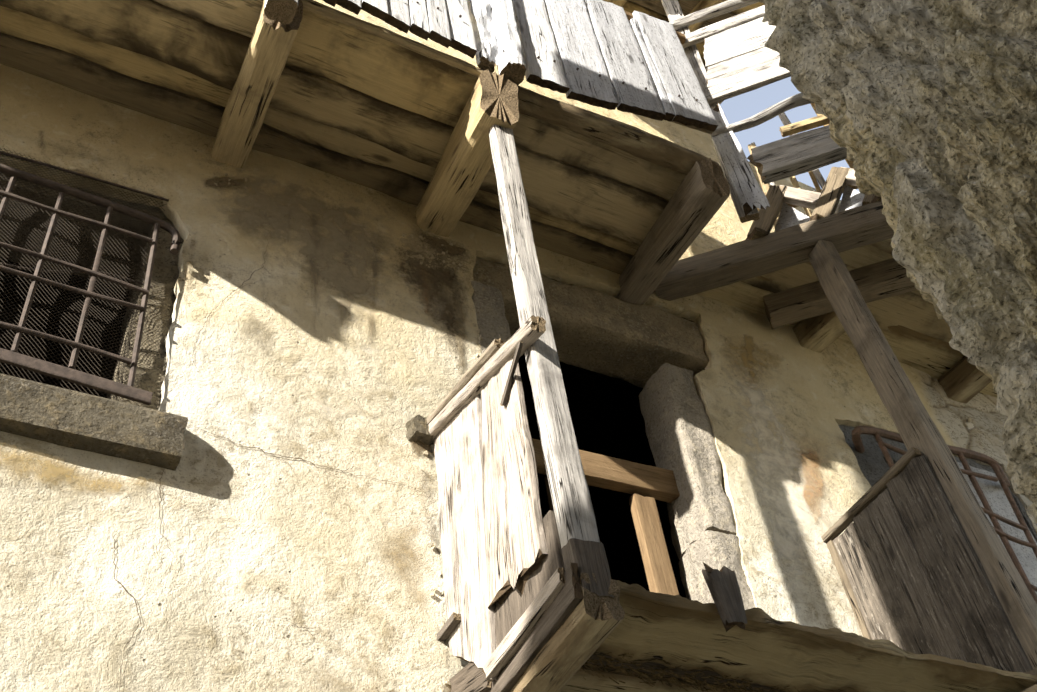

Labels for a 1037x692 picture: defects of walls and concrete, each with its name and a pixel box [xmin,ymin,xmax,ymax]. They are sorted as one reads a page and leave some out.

crack [192,239,272,365]
water stain [229,179,384,314]
water stain [399,233,465,367]
crack [156,470,171,552]
crack [205,431,419,489]
crack [113,533,141,692]